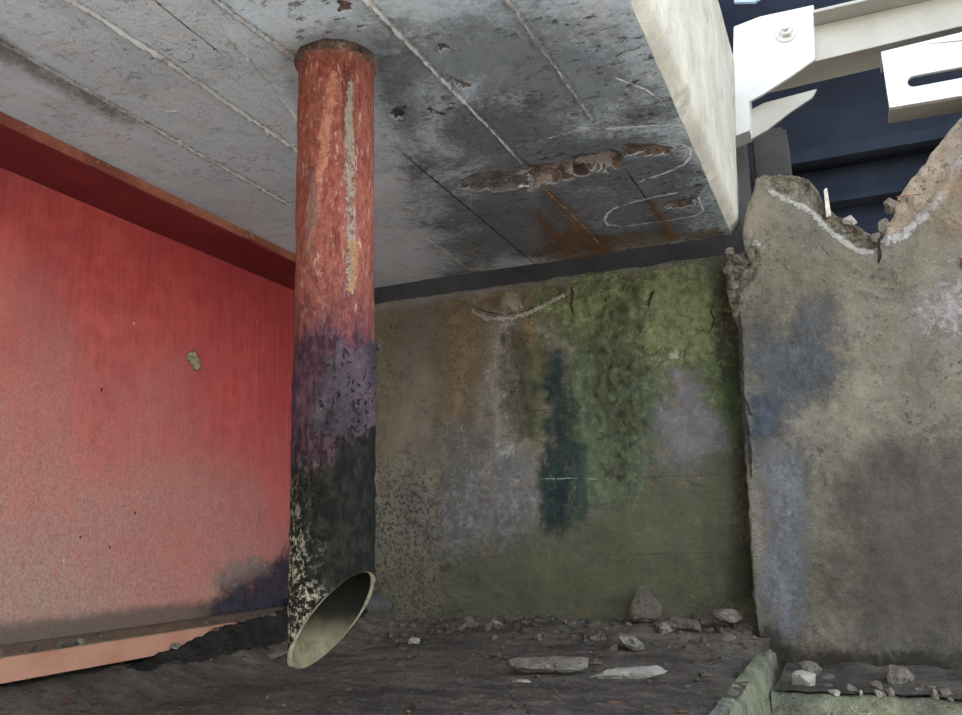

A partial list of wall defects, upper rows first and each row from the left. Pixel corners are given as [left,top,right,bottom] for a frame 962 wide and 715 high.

damp [0,40,295,206]
damp [65,0,297,152]
crack [155,0,220,54]
peeling [315,69,358,295]
spalling [526,144,673,183]
spalling [763,118,962,252]
peeling [186,351,201,371]
damp [433,289,962,669]